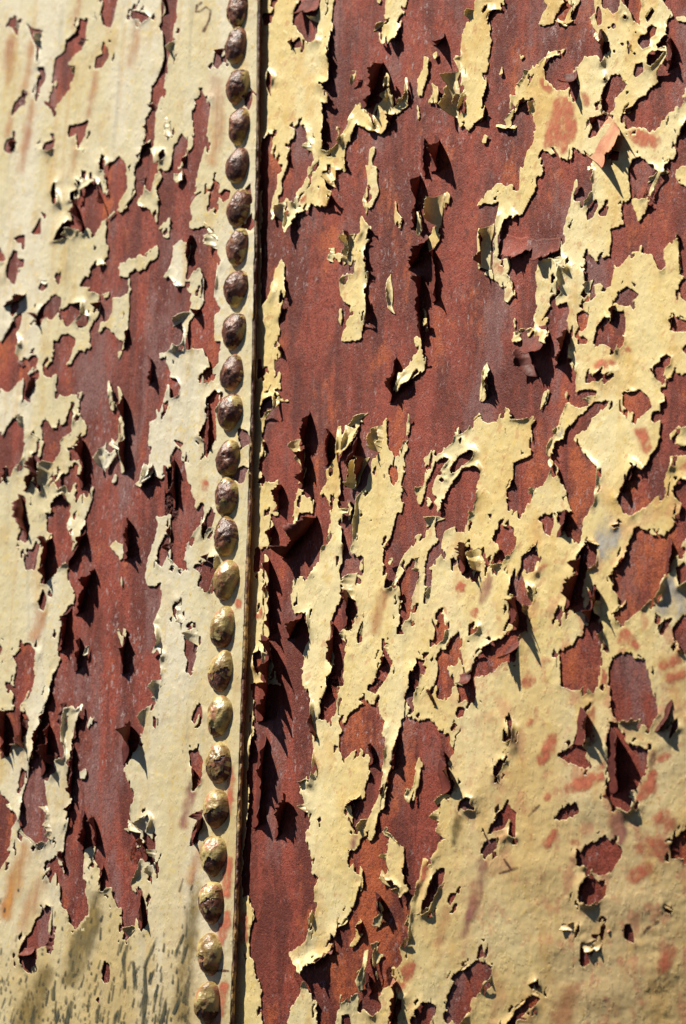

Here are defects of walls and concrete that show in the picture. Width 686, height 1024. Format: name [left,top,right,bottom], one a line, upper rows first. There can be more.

peeling [540,78,589,153]
peeling [629,129,657,147]
peeling [635,428,651,453]
rust [0,0,230,973]
rust [232,0,686,1024]
peeling [619,629,638,649]
peeling [585,708,594,740]
peeling [538,734,556,764]
peeling [570,763,605,791]
peeling [634,754,669,802]
peeling [222,857,232,897]
peeling [398,963,415,992]